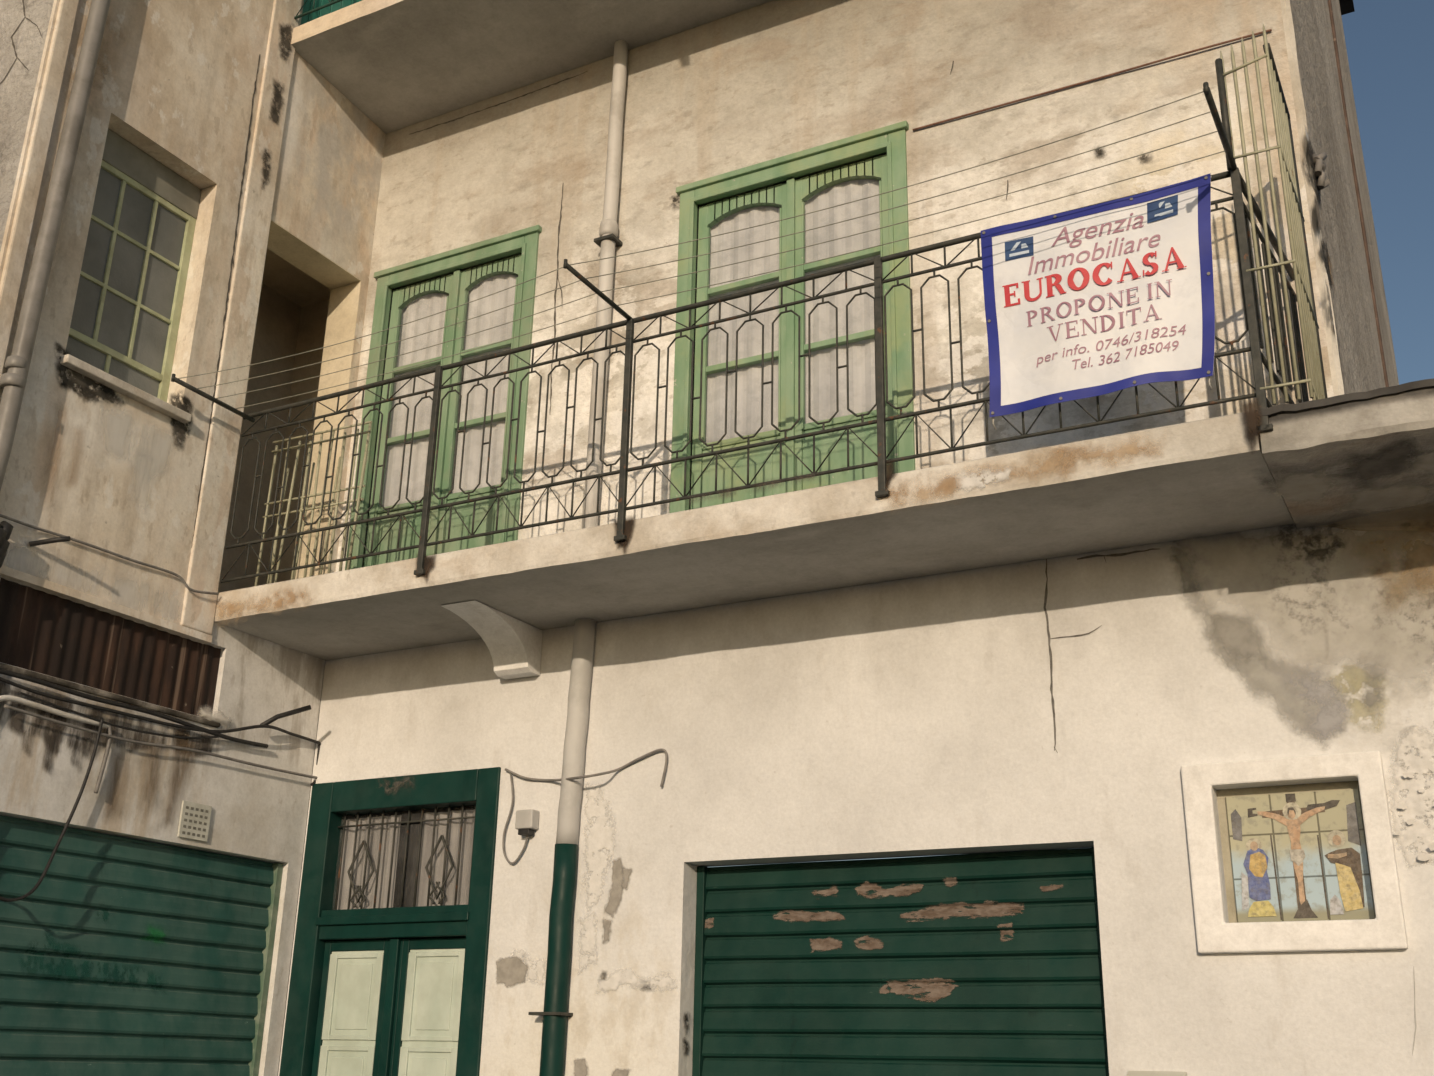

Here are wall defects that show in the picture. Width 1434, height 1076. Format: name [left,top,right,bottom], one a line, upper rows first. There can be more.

crack [0,0,42,83]
water stain [279,25,292,60]
water stain [269,82,283,123]
water stain [262,149,270,187]
water stain [56,343,192,502]
crack [1043,548,1157,753]
water stain [1177,523,1434,723]
water stain [44,736,54,771]
peeling [1391,726,1434,865]
peeling [579,785,676,992]
peeling [496,951,545,987]
peeling [574,1059,588,1076]